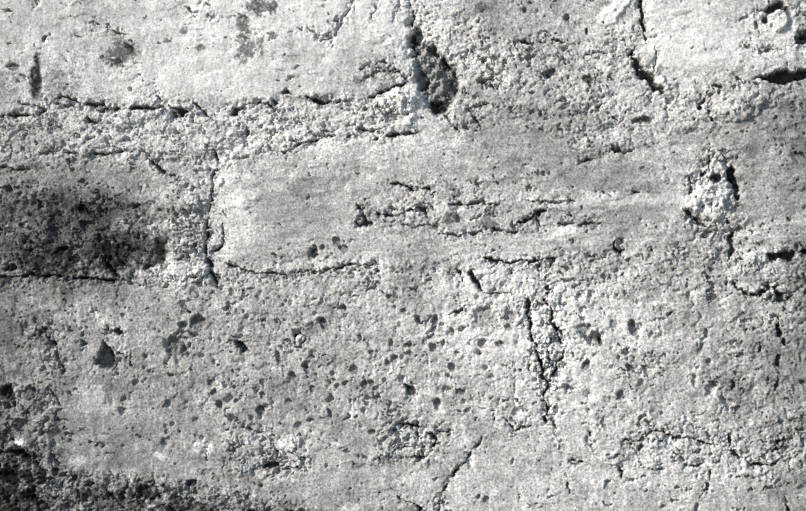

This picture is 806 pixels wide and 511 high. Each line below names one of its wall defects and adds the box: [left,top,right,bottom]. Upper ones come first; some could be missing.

crack [635,0,658,75]
crack [0,88,166,125]
crack [192,0,499,155]
crack [181,147,379,290]
crack [354,180,626,260]
crack [648,245,686,254]
crack [386,255,595,511]
crack [729,378,737,391]
crack [757,318,806,395]
crack [611,462,624,480]
crack [620,426,792,511]